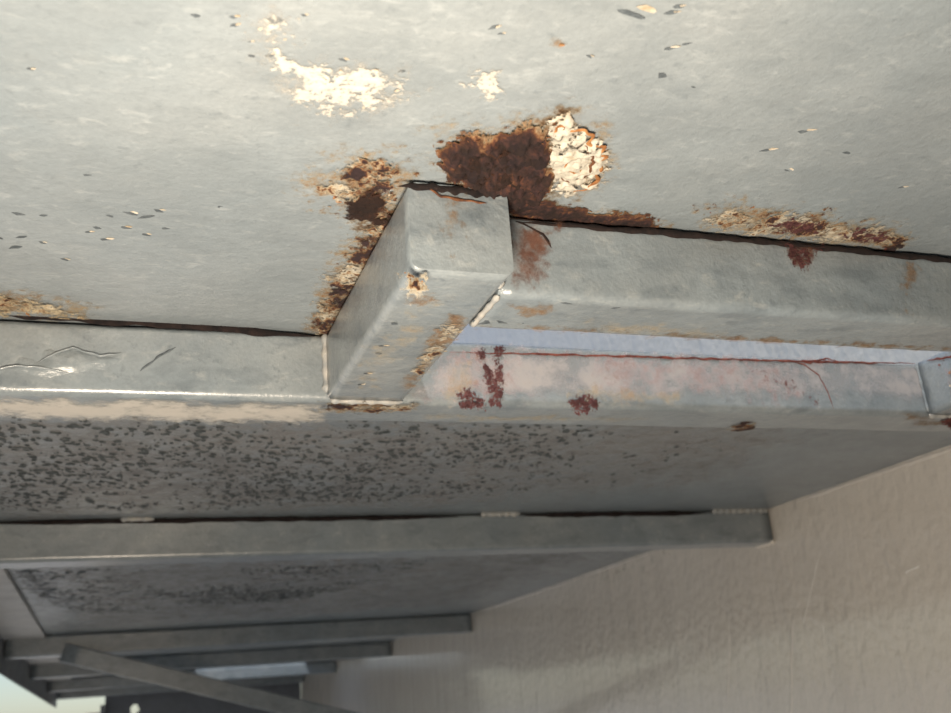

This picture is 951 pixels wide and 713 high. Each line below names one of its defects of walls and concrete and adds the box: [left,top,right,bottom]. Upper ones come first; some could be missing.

peeling [229,12,420,117]
peeling [459,70,504,102]
peeling [540,106,613,201]
corrosion [433,108,673,278]
corrosion [301,152,419,336]
corrosion [693,199,912,273]
corrosion [0,290,98,322]
corrosion [567,394,600,416]
corrosion [456,345,914,412]
corrosion [725,421,756,432]